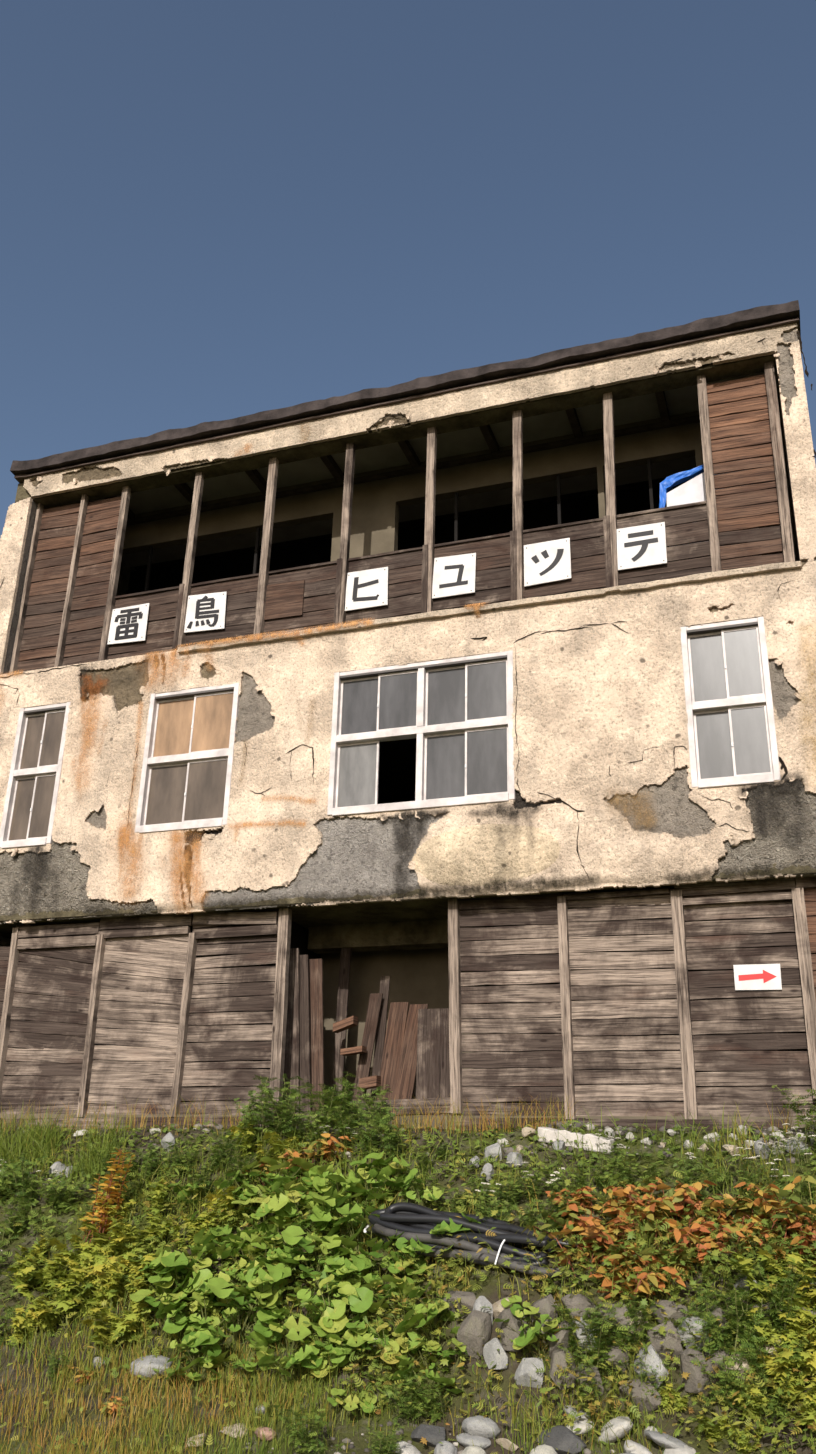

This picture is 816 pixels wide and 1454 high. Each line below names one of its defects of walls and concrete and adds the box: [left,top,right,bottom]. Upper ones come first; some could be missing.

peeling [774,328,799,416]
peeling [77,660,149,711]
peeling [236,672,277,743]
crack [471,621,628,878]
peeling [768,659,803,719]
spalling [0,841,158,924]
spalling [201,810,448,911]
spalling [604,766,816,880]